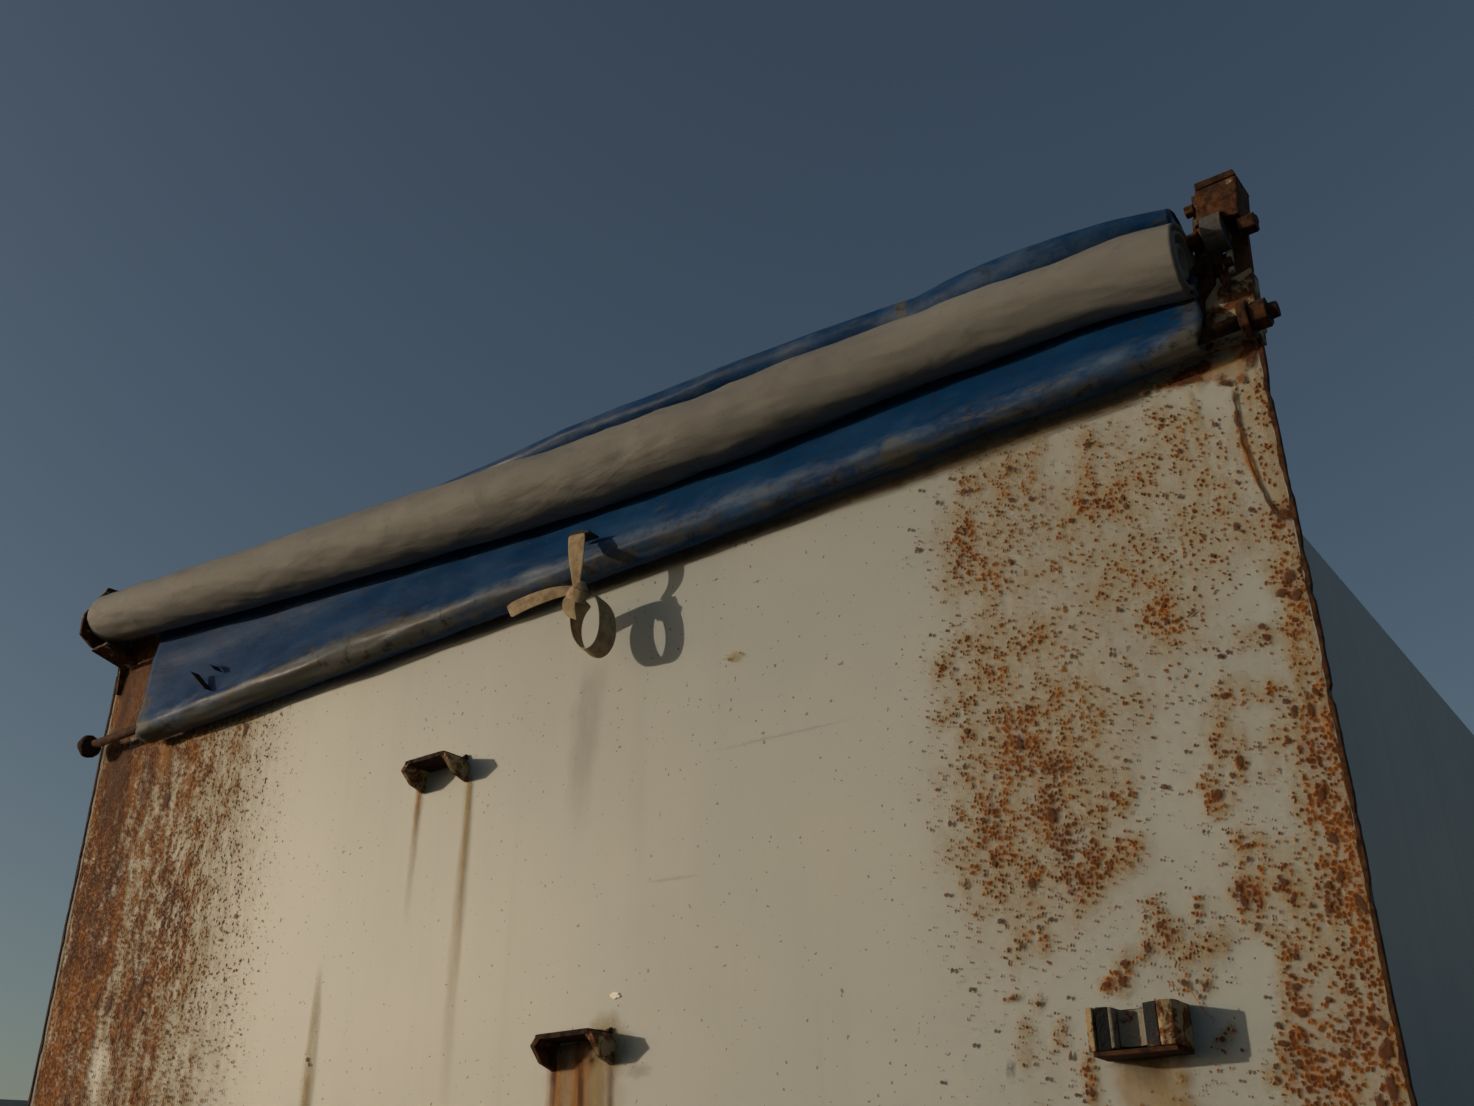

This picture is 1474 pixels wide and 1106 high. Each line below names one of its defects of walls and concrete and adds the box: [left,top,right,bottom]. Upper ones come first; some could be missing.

rust [27,632,307,1106]
rust [550,1040,602,1106]